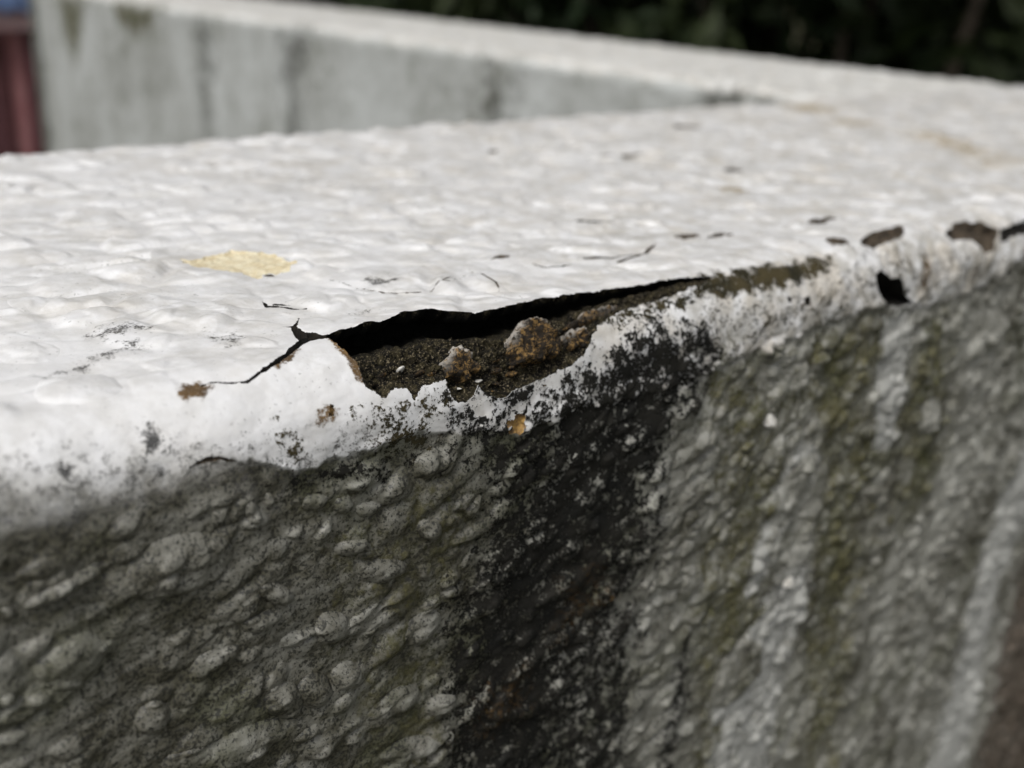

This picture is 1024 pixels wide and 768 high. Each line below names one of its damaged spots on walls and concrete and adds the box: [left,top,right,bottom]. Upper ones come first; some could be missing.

spalling [825,225,905,249]
spalling [945,220,1024,253]
crack [201,302,329,386]
spalling [323,276,716,403]
leakage [259,310,727,768]